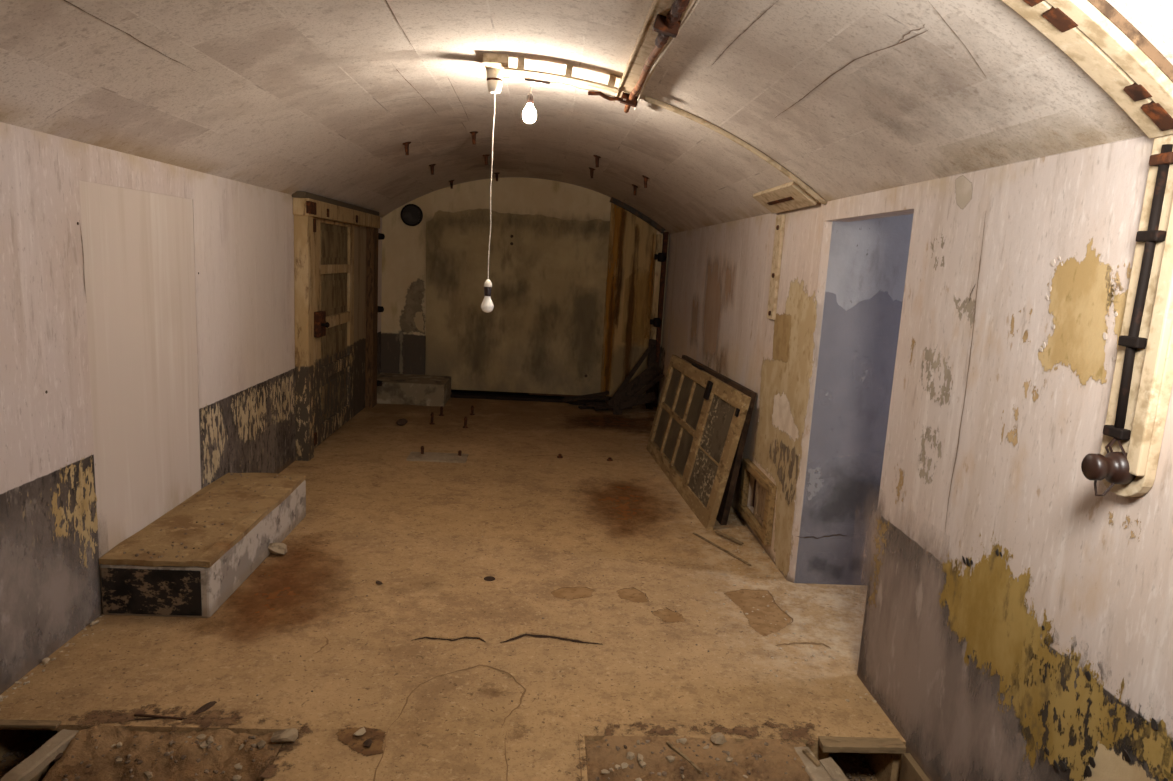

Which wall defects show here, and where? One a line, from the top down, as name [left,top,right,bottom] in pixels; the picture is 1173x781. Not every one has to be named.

crack [775,2,986,118]
peeling [1000,236,1132,446]
peeling [0,453,98,676]
peeling [200,374,295,484]
rust [220,536,333,636]
crack [373,622,603,781]
rust [583,483,660,533]
peeling [753,277,824,577]
peeling [919,428,942,484]
peeling [861,504,1173,781]